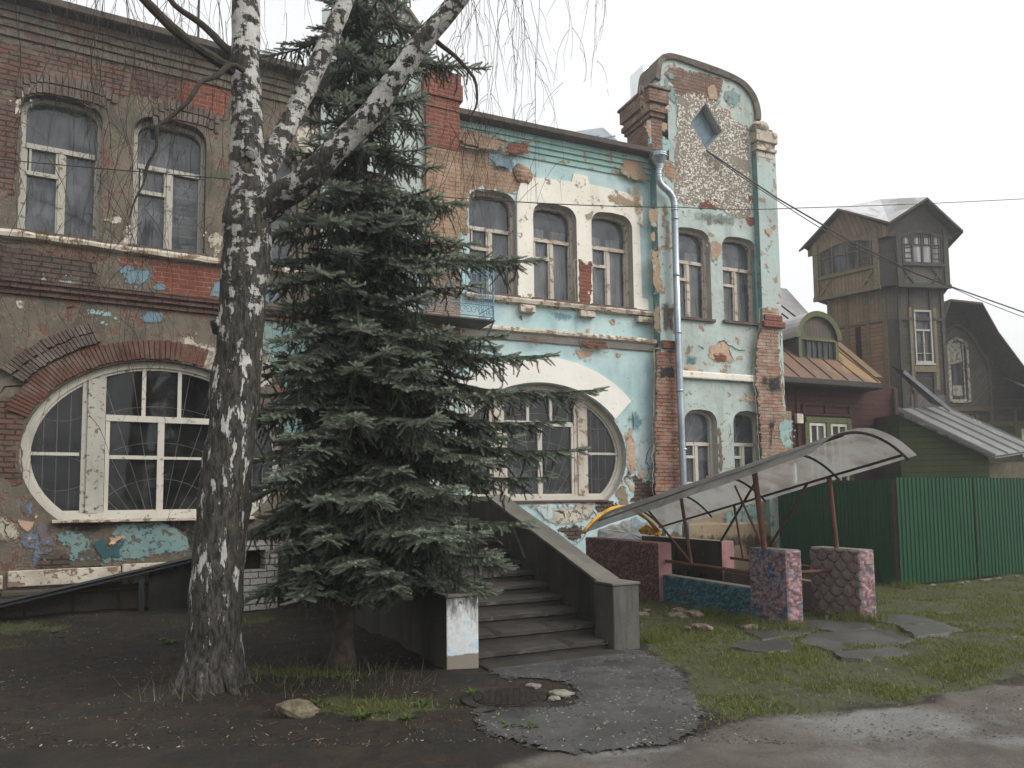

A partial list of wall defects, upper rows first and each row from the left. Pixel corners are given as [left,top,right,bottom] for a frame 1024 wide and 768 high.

flaking render [459,126,530,236]
flaking render [0,239,220,300]
flaking render [573,259,595,305]
flaking render [608,158,671,333]
flaking render [558,307,796,545]